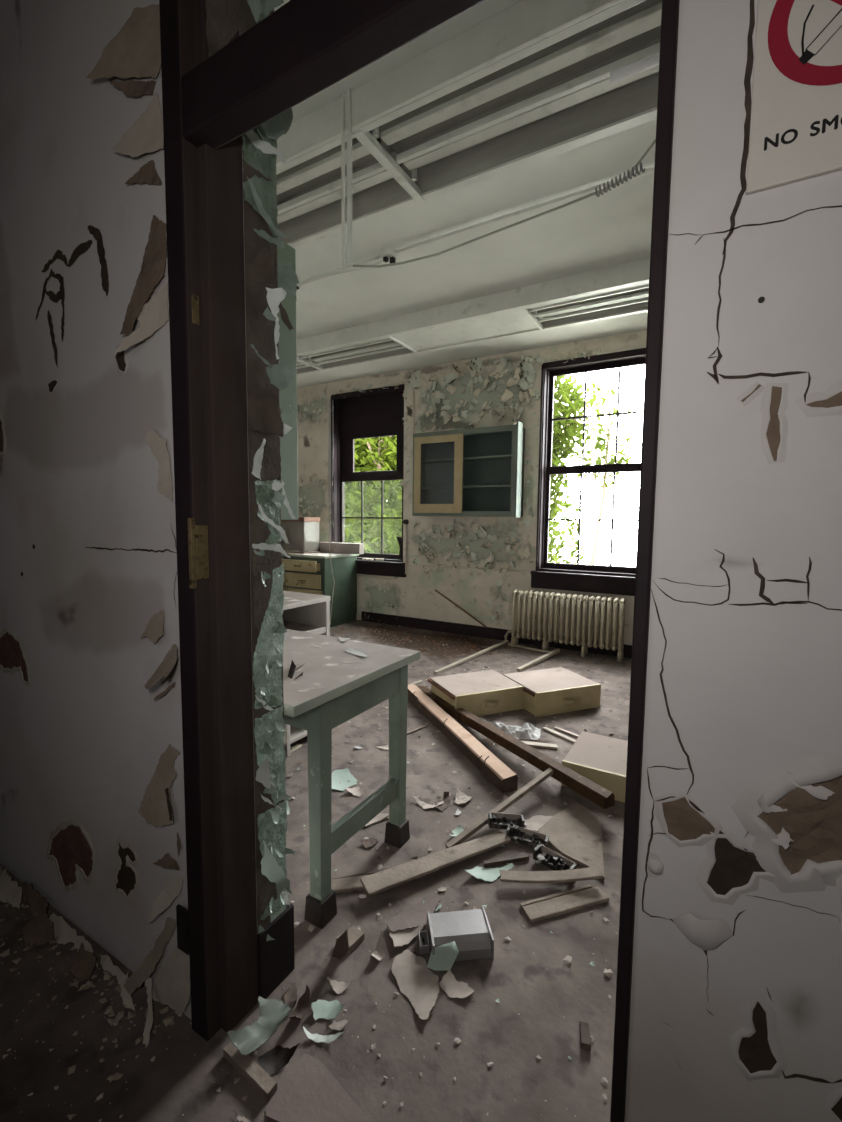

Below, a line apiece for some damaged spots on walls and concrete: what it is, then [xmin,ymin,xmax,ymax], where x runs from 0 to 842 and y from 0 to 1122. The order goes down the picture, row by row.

peeling [86,4,164,185]
crack [671,0,842,403]
peeling [113,215,169,376]
spalling [736,379,842,464]
peeling [242,108,333,942]
crack [642,549,842,922]
peeling [48,913,190,1047]
peeling [114,744,181,905]
spalling [655,749,842,933]
spalling [730,991,788,1081]
crack [733,895,836,936]
crack [782,1070,842,1083]